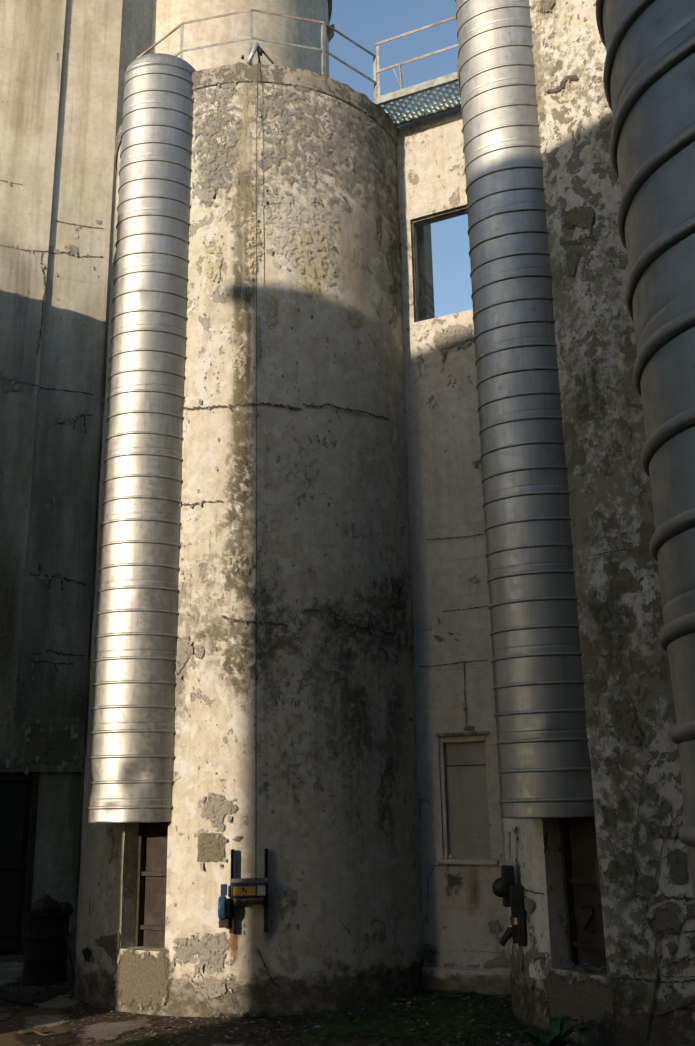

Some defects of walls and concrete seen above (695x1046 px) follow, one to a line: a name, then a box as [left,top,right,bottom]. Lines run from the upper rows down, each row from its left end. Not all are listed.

peeling [531,0,612,151]
peeling [552,194,627,286]
crack [1,244,104,354]
leakage [236,266,249,331]
crack [1,375,94,434]
leakage [232,357,249,520]
crack [182,399,389,420]
spalling [82,932,233,1015]